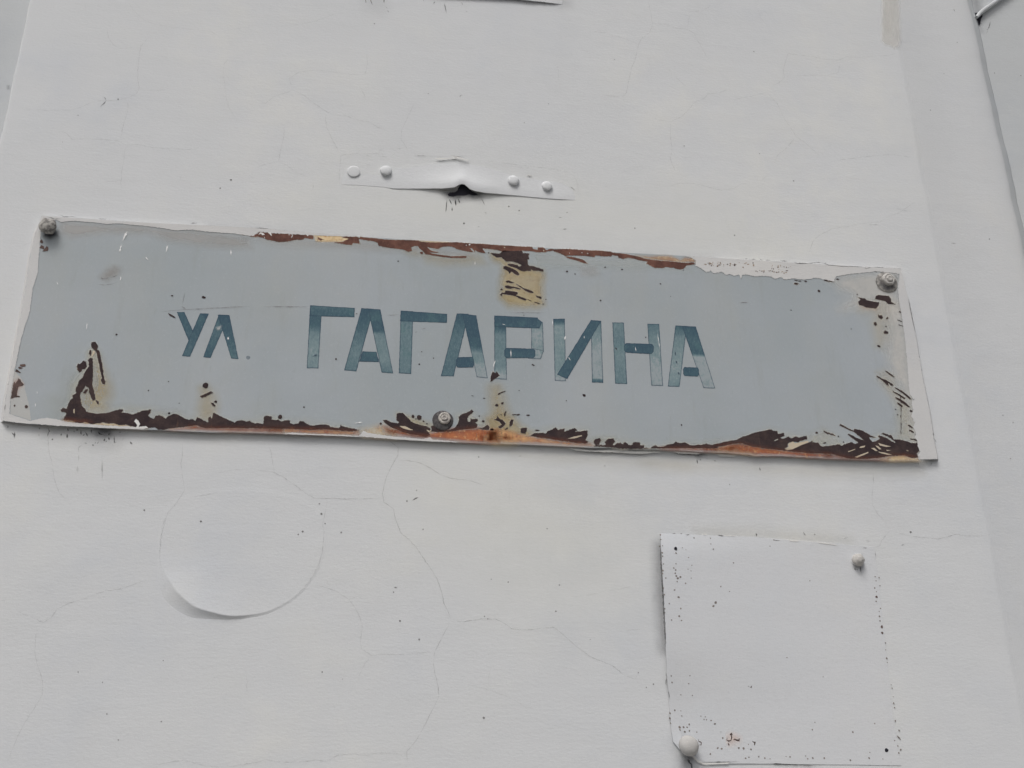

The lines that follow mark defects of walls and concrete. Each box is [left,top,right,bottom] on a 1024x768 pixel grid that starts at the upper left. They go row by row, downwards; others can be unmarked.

crack [660,533,675,639]